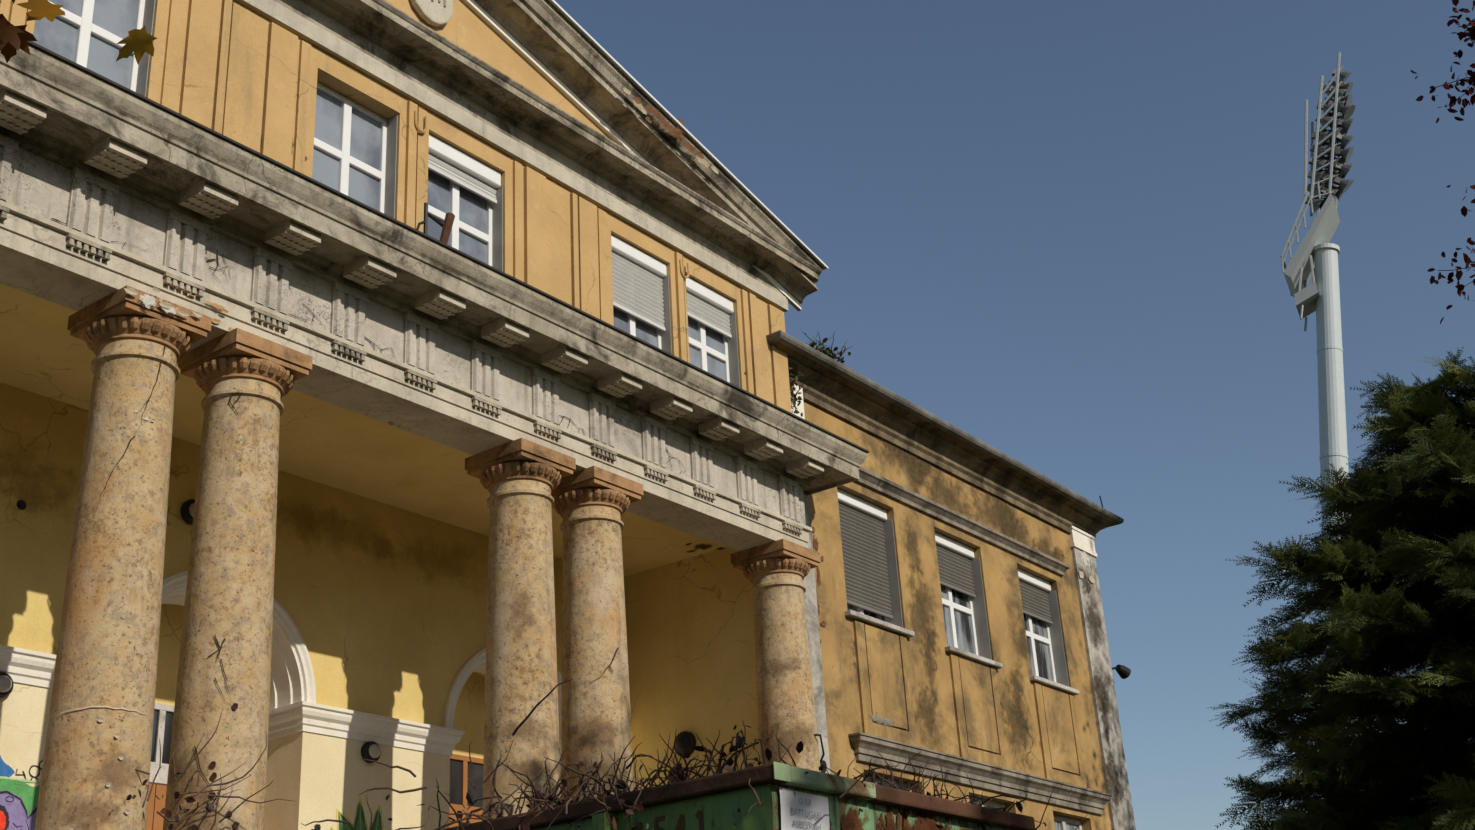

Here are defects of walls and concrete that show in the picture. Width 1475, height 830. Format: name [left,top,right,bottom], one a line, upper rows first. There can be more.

flaking render [623,87,718,174]